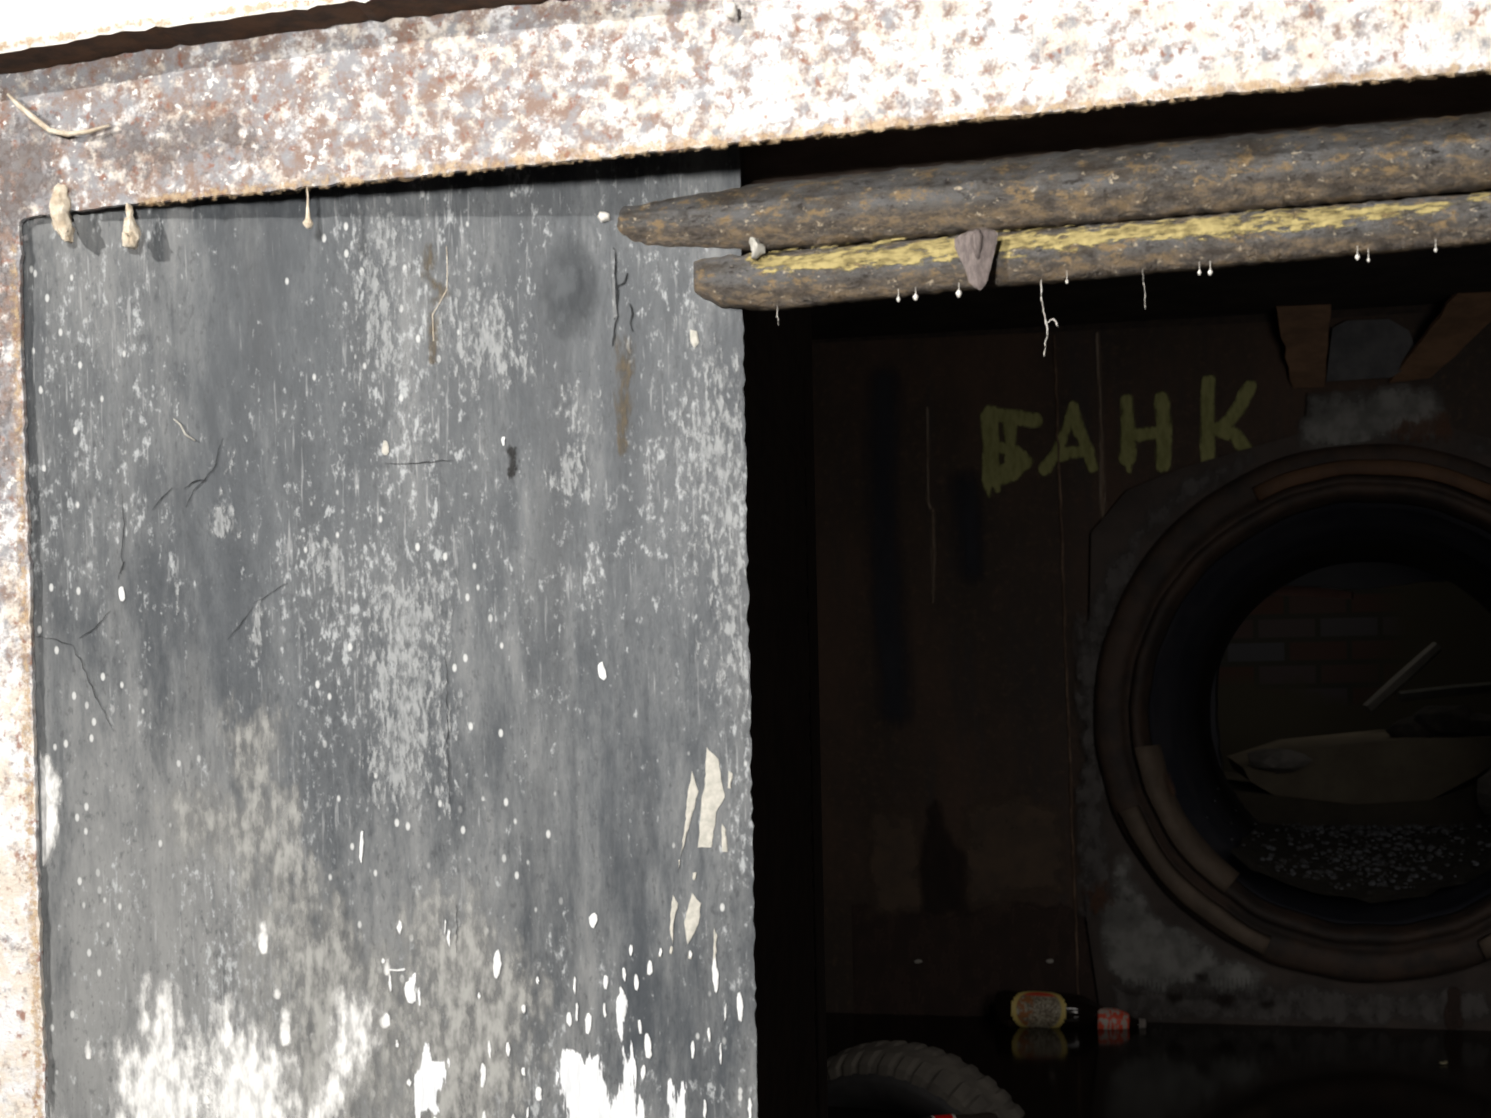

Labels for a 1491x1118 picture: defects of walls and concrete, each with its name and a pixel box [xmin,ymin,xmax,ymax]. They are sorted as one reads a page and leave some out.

rust [211,0,332,14]
rust [1328,64,1488,83]
rust [89,78,1310,204]
rust [0,118,64,530]
crack [37,439,223,731]
rust [22,649,42,1117]
peeling [258,922,268,954]
peeling [382,958,421,1006]
peeling [493,949,502,979]
peeling [512,748,743,1118]
peeling [114,978,399,1118]
peeling [407,1042,450,1118]